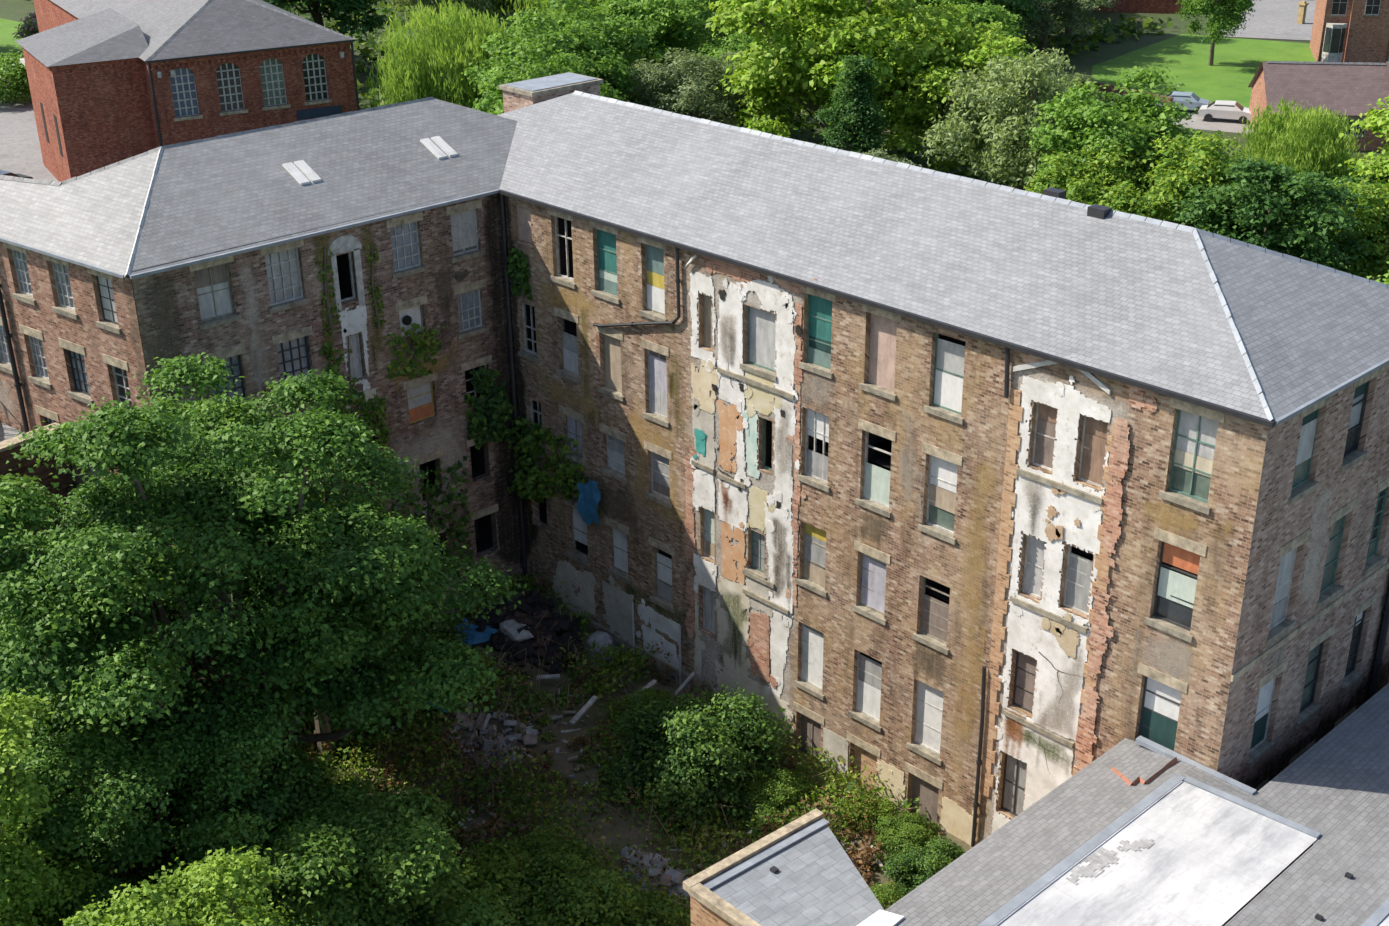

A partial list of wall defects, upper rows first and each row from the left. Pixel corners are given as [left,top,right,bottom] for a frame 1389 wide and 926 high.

peeling [552,256,818,742]
damp [773,520,790,596]
peeling [939,352,1159,846]